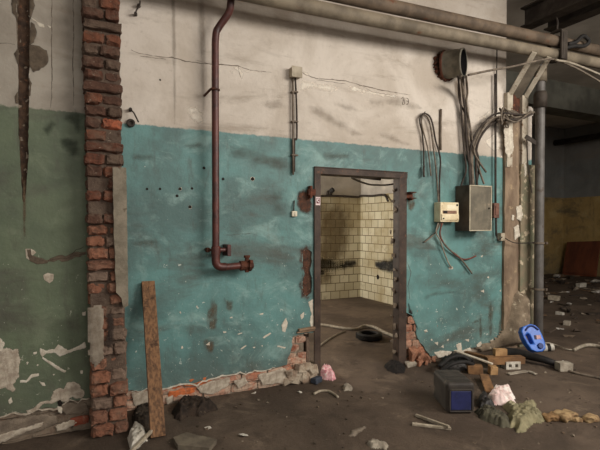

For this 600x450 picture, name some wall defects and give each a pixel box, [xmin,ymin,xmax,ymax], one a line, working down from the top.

crack [132,50,265,74]
crack [302,72,408,95]
rust [297,191,312,213]
spalling [162,246,319,404]
spalling [406,294,482,367]
peeling [0,338,86,404]
spalling [0,382,91,444]
spalling [127,388,148,411]